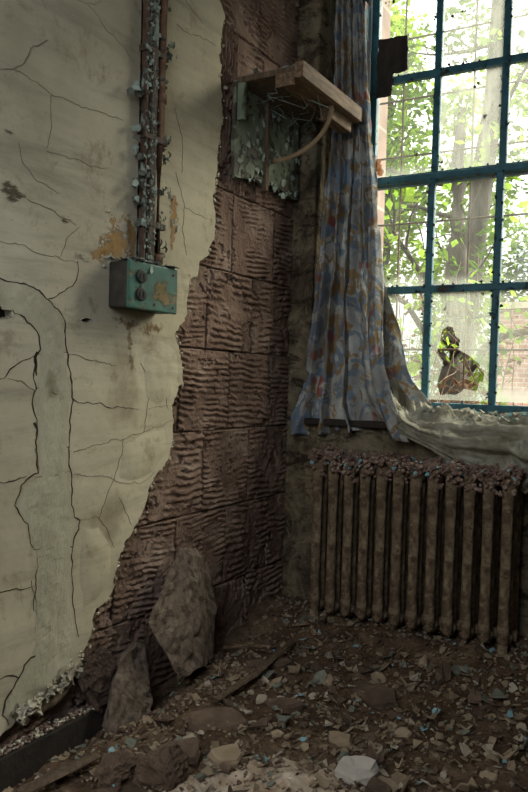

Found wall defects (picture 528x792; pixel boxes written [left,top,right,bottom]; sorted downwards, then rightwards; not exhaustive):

crack [0,40,122,169]
crack [0,143,171,637]
spalling [0,0,300,749]
crack [1,655,36,725]